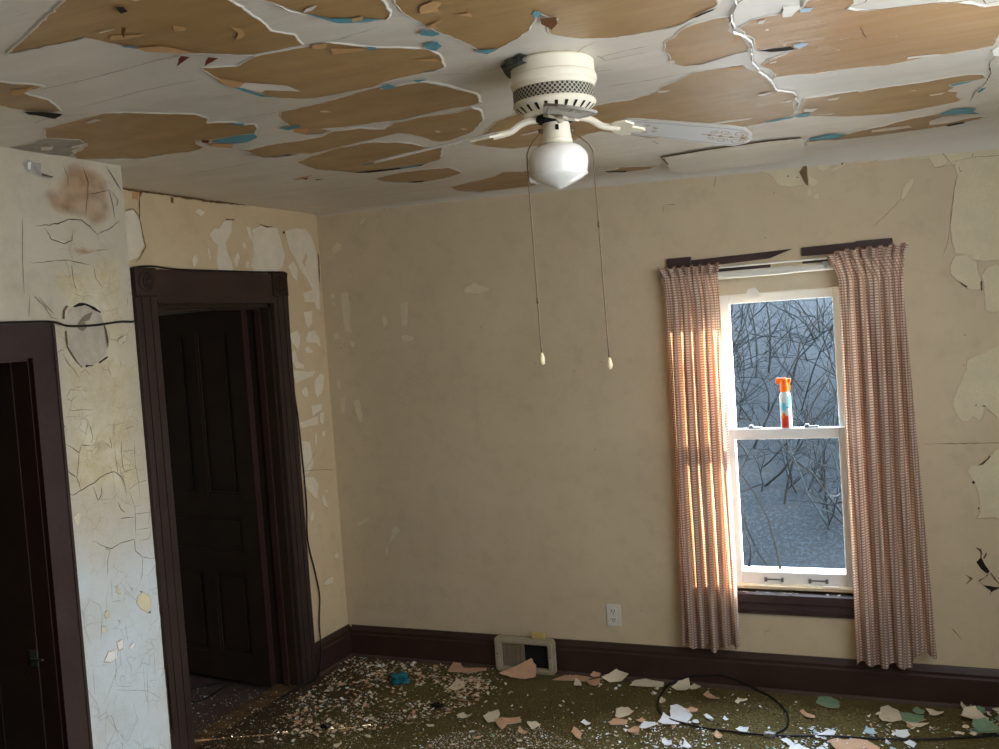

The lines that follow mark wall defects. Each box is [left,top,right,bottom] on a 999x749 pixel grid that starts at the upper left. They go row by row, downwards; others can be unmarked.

peeling [0,0,999,193]
crack [838,0,997,39]
damp [36,160,114,232]
peeling [125,209,144,261]
peeling [761,166,819,199]
peeling [946,149,999,313]
crack [22,164,161,749]
damp [45,244,148,505]
peeling [209,219,328,521]
peeling [952,344,999,422]
peeling [967,447,999,520]
peeling [71,486,171,749]